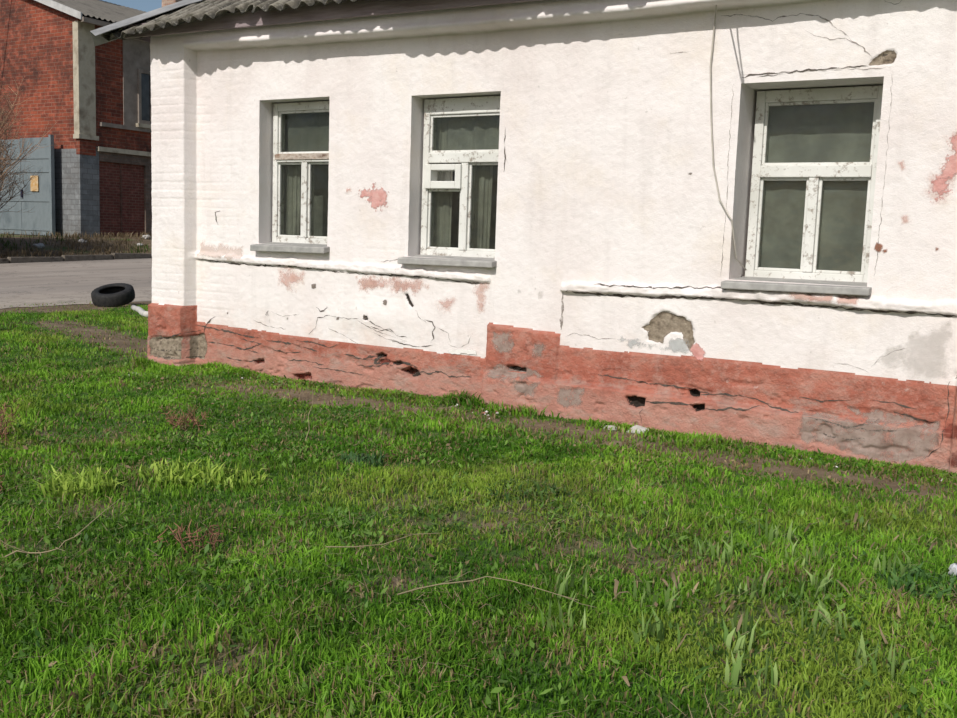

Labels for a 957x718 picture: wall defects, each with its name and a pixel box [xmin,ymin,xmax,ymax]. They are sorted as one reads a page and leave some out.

flaking render [869,50,897,65]
peeling [346,183,388,212]
crack [560,13,957,340]
peeling [927,135,957,202]
crack [152,307,470,378]
flaking render [642,311,695,350]
crack [598,374,950,457]
flaking render [800,408,957,462]